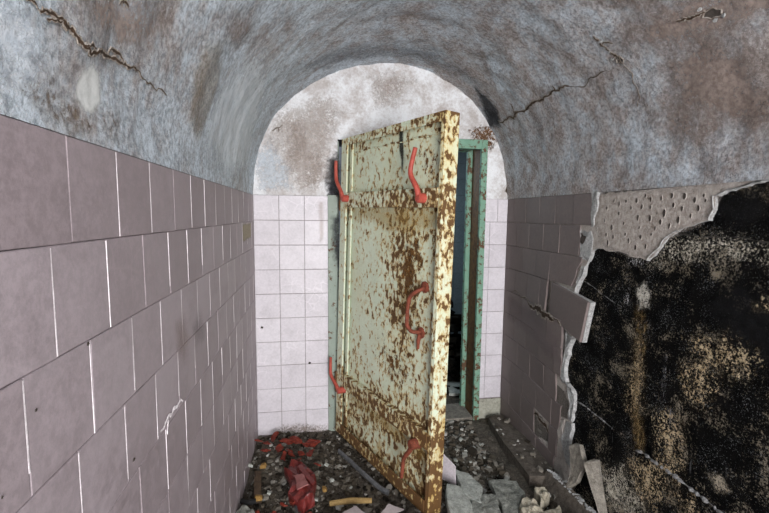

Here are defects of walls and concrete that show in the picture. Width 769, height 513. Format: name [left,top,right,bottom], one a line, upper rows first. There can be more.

crack [26,0,167,96]
leakage [475,88,500,127]
crack [498,36,640,124]
leakage [325,156,341,197]
leakage [625,284,650,308]
spalling [535,180,769,513]